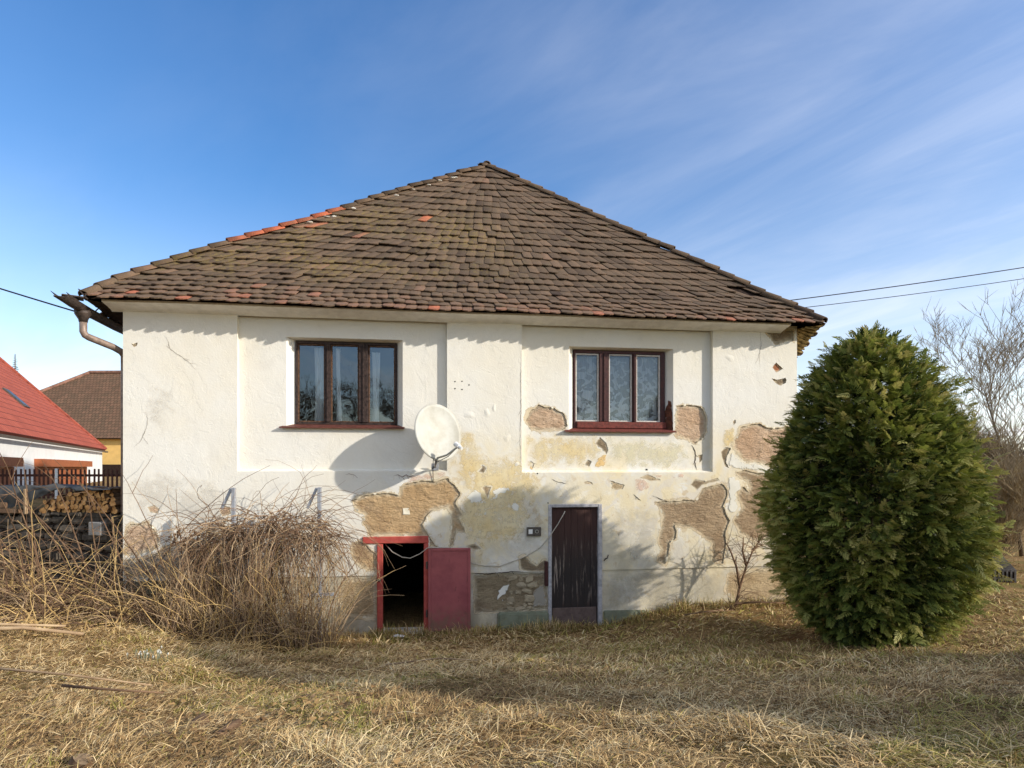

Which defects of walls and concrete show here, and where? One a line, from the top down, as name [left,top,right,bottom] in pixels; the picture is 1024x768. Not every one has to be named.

flaking render [772,363,787,385]
flaking render [338,401,708,622]
flaking render [654,419,789,602]